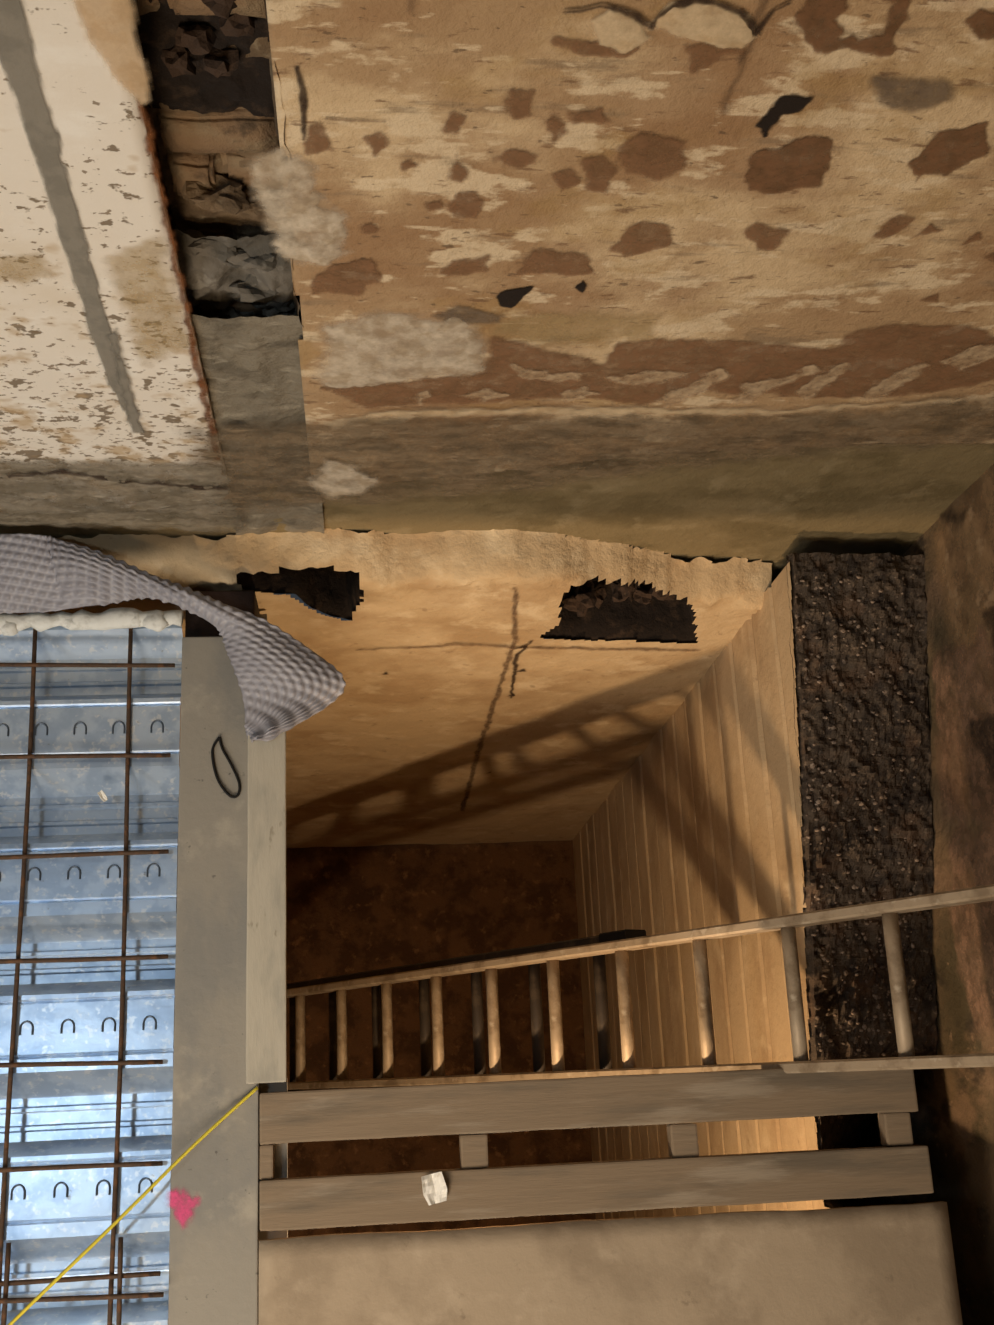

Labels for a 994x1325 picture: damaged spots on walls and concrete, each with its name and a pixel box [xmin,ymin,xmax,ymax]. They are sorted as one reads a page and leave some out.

flaking render [0,0,994,535]
spalling [236,565,364,621]
crack [408,588,695,811]
spalling [540,575,698,644]